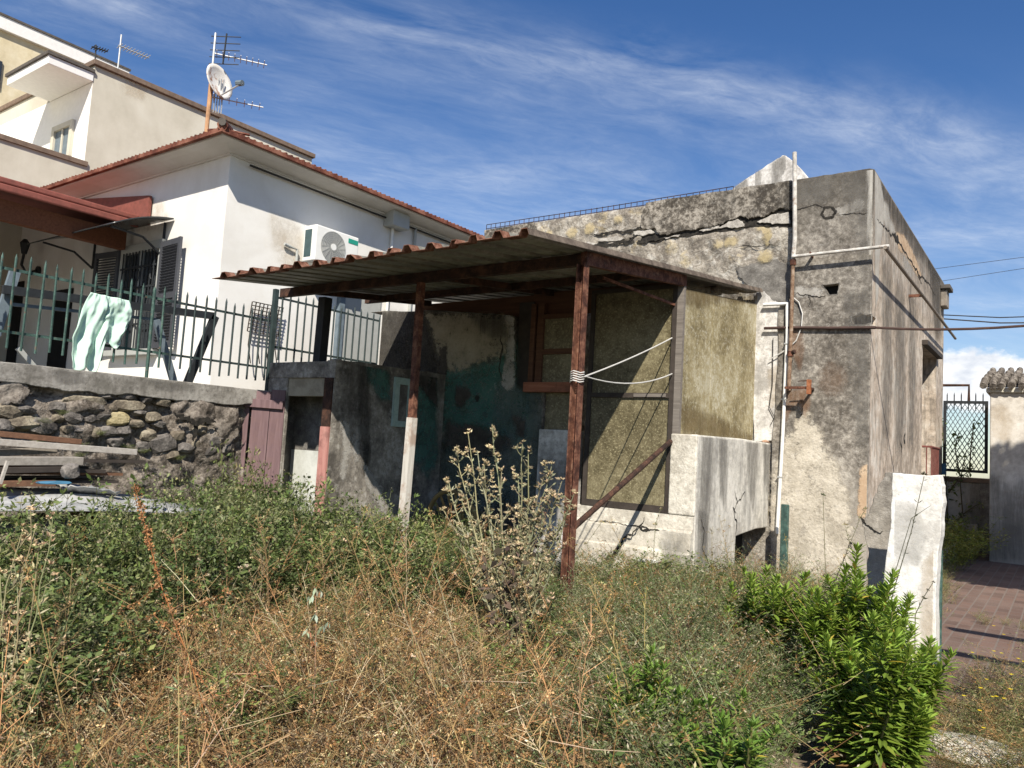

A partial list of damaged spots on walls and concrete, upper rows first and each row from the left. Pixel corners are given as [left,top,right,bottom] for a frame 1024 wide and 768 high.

crack [587,199,935,295]
flaking render [896,233,921,277]